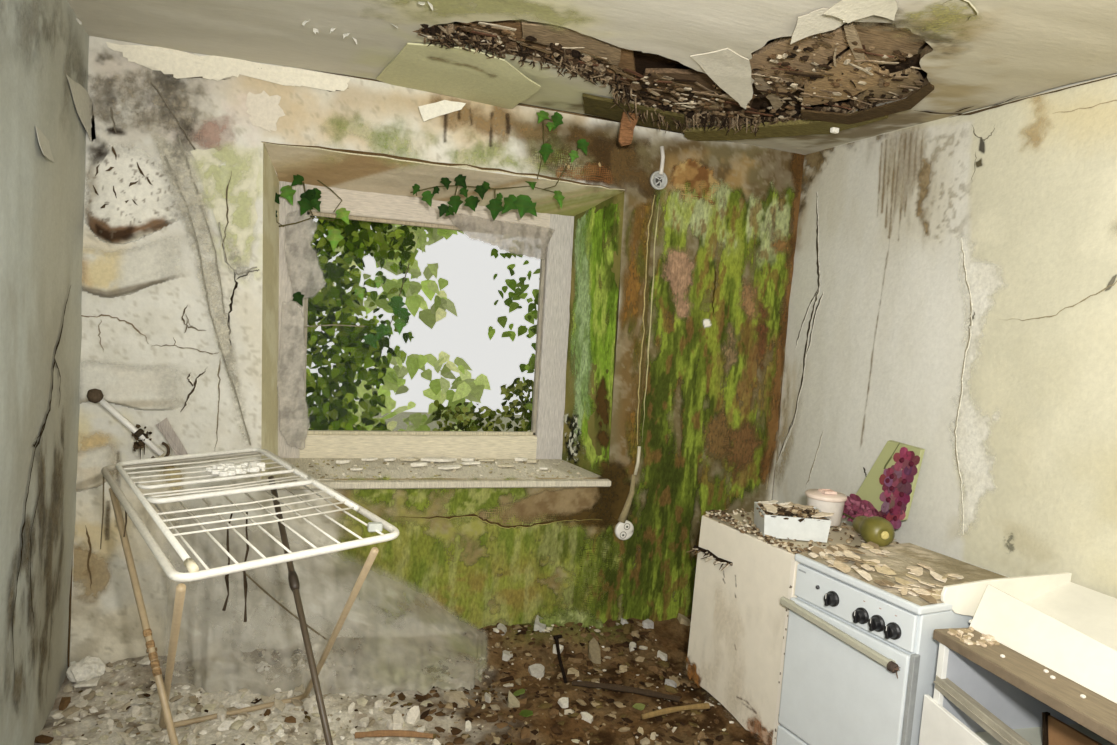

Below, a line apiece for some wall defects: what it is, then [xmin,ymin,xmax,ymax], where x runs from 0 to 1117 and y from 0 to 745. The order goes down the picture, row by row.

peeling [66,75,96,141]
leakage [155,71,192,158]
peeling [376,43,541,122]
crack [914,75,1117,179]
leakage [791,147,834,212]
leakage [879,140,931,237]
crack [766,193,824,489]
peeling [951,238,1003,535]
crack [1008,281,1117,321]
crack [12,269,260,680]
leakage [564,414,584,464]
leakage [587,377,632,526]